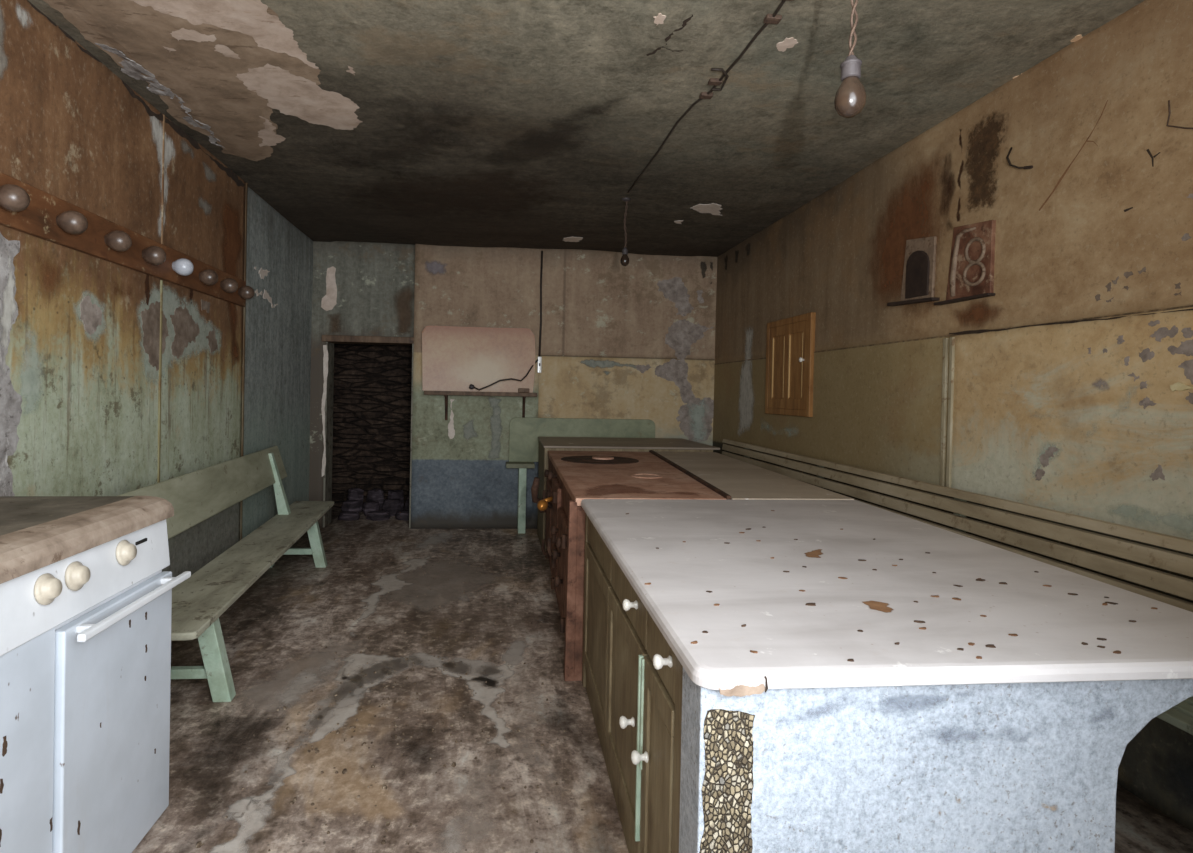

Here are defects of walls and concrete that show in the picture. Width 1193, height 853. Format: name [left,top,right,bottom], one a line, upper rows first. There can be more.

water stain [17,6,27,25]
peeling [43,0,362,161]
water stain [150,116,215,234]
spalling [692,203,722,215]
mould [957,113,1005,221]
spalling [0,233,40,496]
peeling [76,296,105,339]
peeling [139,290,220,379]
peeling [321,266,337,311]
peeling [581,277,714,442]
peeling [1087,320,1193,409]